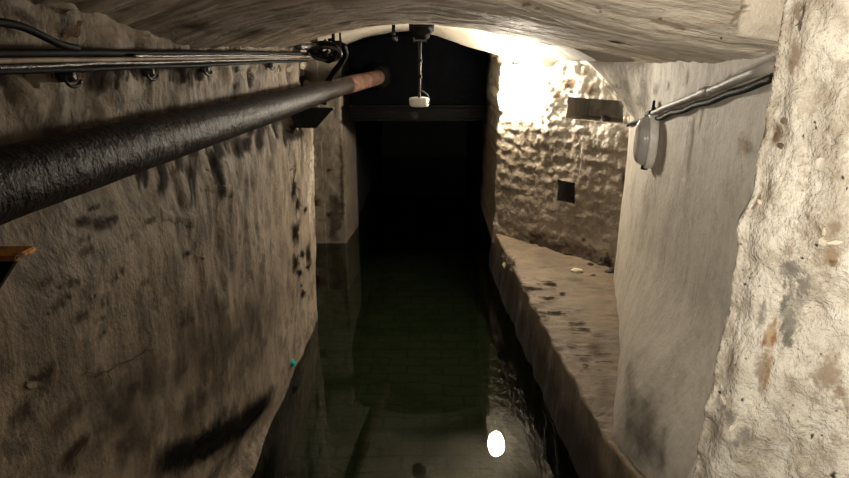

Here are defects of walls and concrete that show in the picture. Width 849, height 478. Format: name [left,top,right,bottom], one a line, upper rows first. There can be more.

corrosion [762,320,776,348]
damp [160,386,275,472]